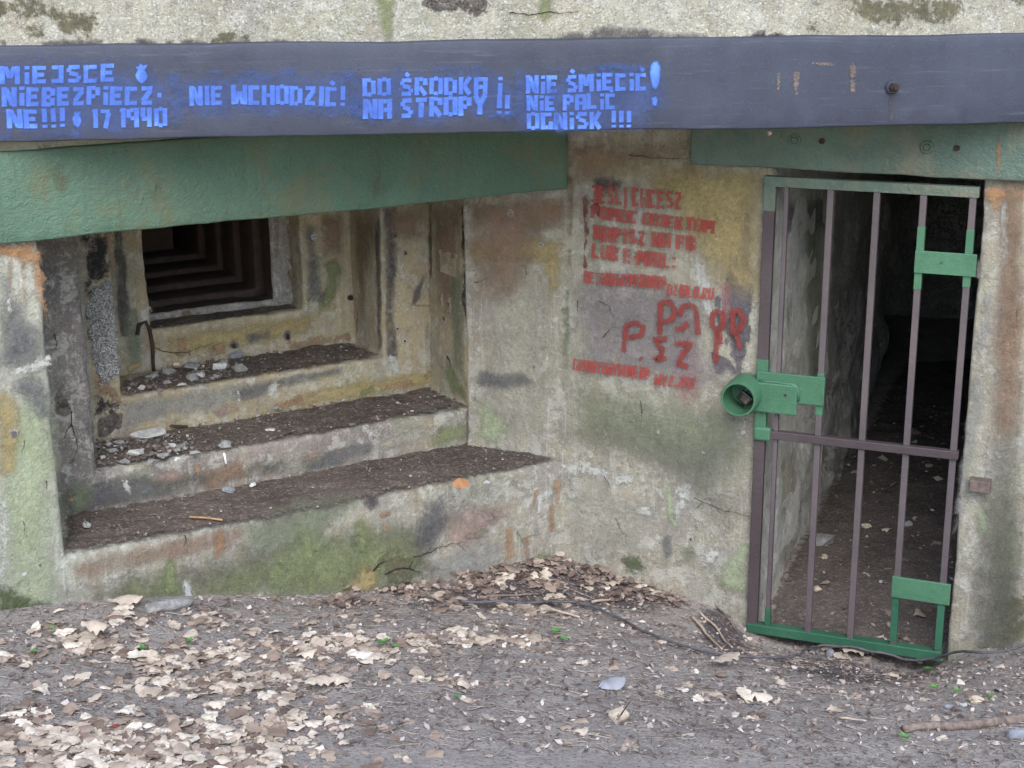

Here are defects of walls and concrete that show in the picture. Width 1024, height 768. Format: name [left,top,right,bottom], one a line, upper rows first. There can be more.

corrosion [986,188,1024,210]
water stain [2,299,51,416]
water stain [128,500,445,596]
crack [373,538,478,580]